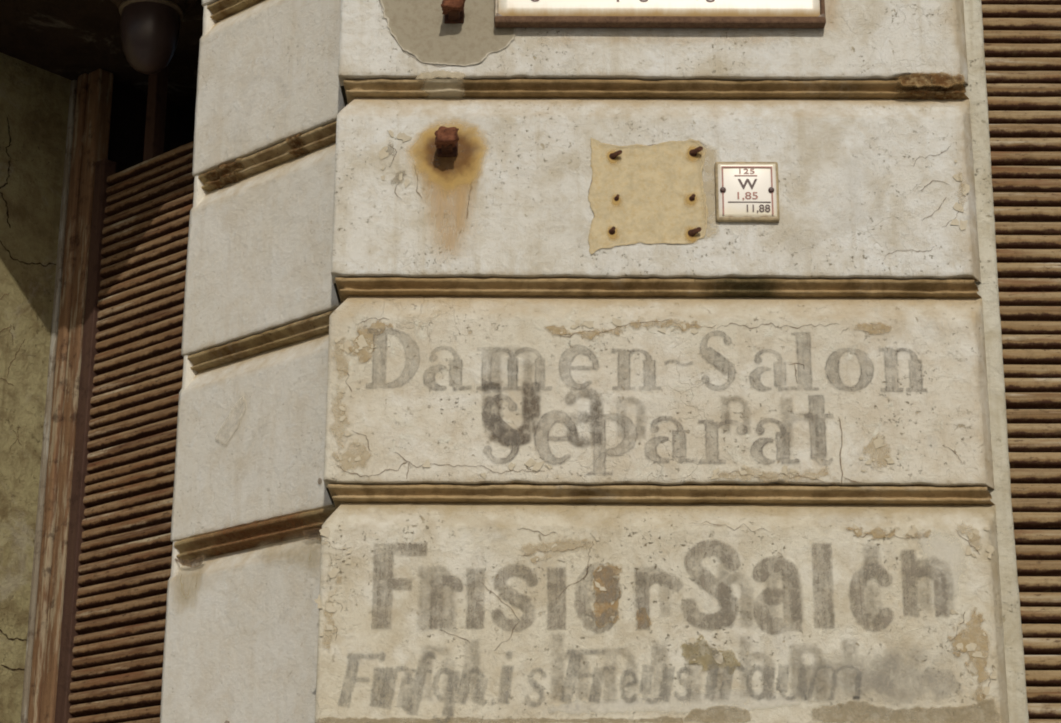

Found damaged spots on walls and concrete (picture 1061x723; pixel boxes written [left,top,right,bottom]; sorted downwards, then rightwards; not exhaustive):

crack [0,117,56,267]
corrosion [410,124,486,249]
peeling [948,607,997,707]